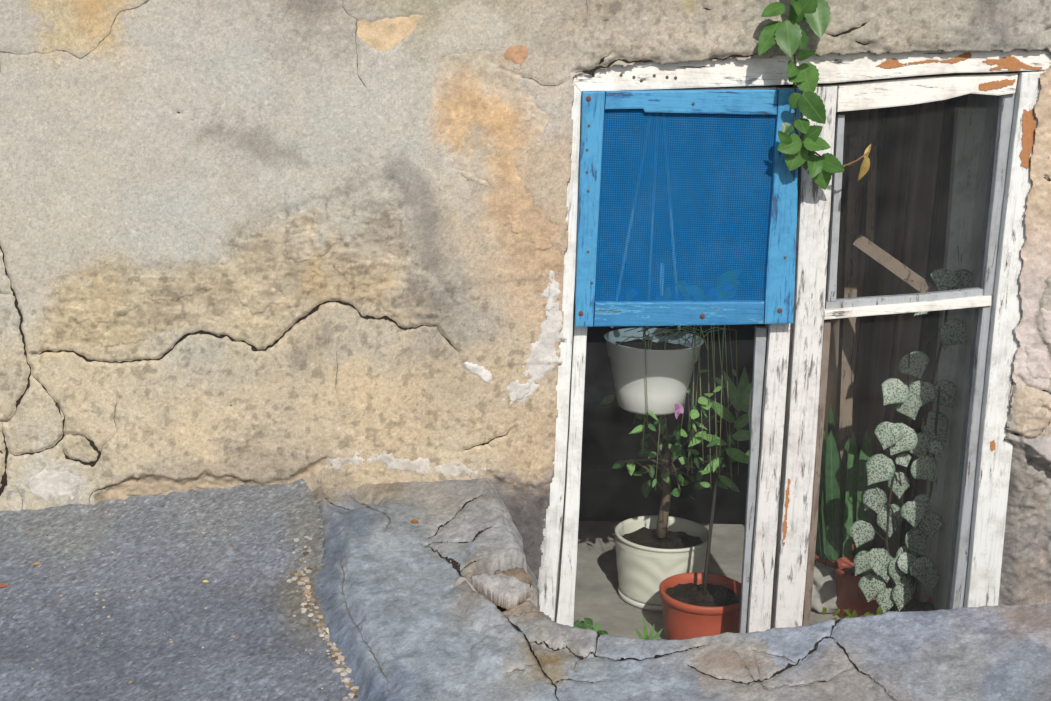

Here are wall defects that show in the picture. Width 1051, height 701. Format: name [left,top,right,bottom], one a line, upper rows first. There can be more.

crack [0,0,149,59]
spalling [357,14,423,51]
crack [826,22,869,45]
spalling [42,189,438,356]
spalling [430,45,567,405]
spalling [878,52,1051,439]
crack [0,246,459,504]
spalling [94,458,330,504]
crack [465,429,511,450]
crack [426,491,491,588]
crack [341,557,390,691]
crack [507,617,897,701]